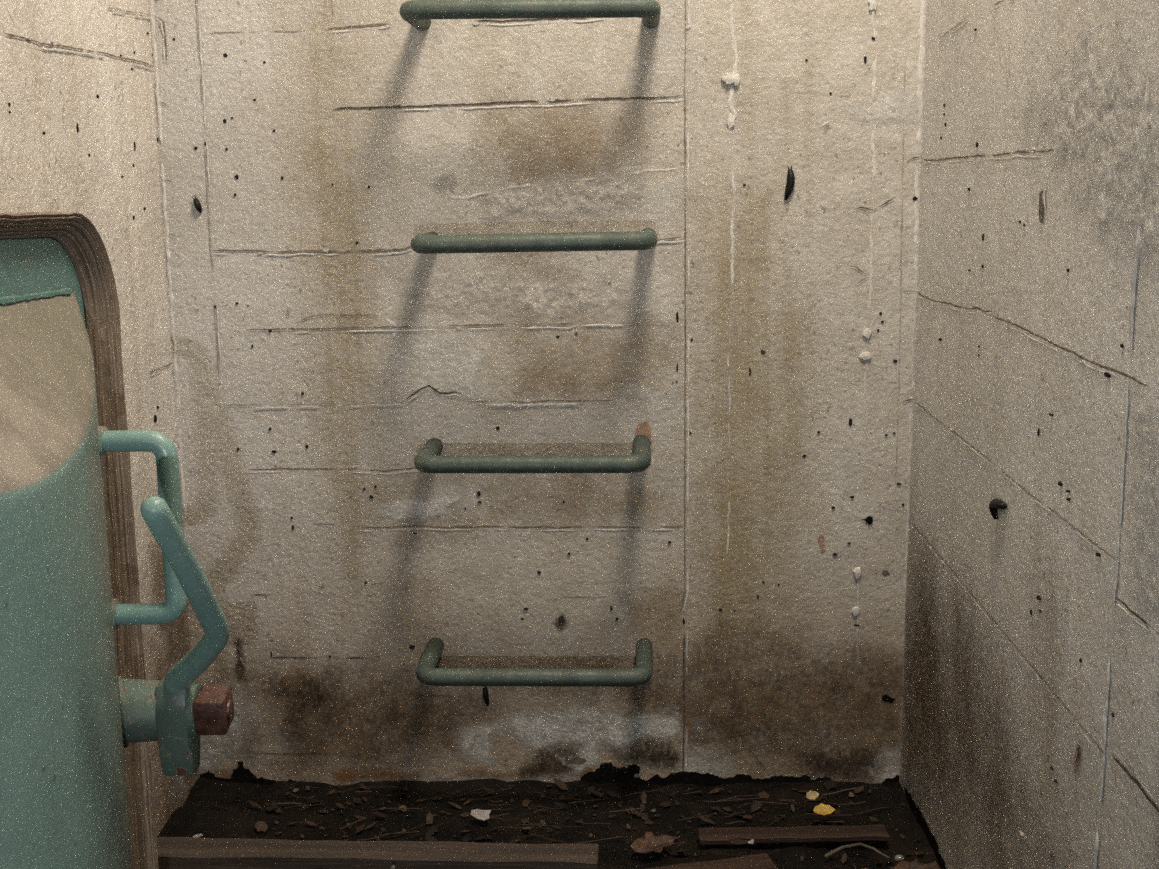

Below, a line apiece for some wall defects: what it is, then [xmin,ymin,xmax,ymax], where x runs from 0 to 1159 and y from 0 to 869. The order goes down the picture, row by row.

damp [170,620,975,869]